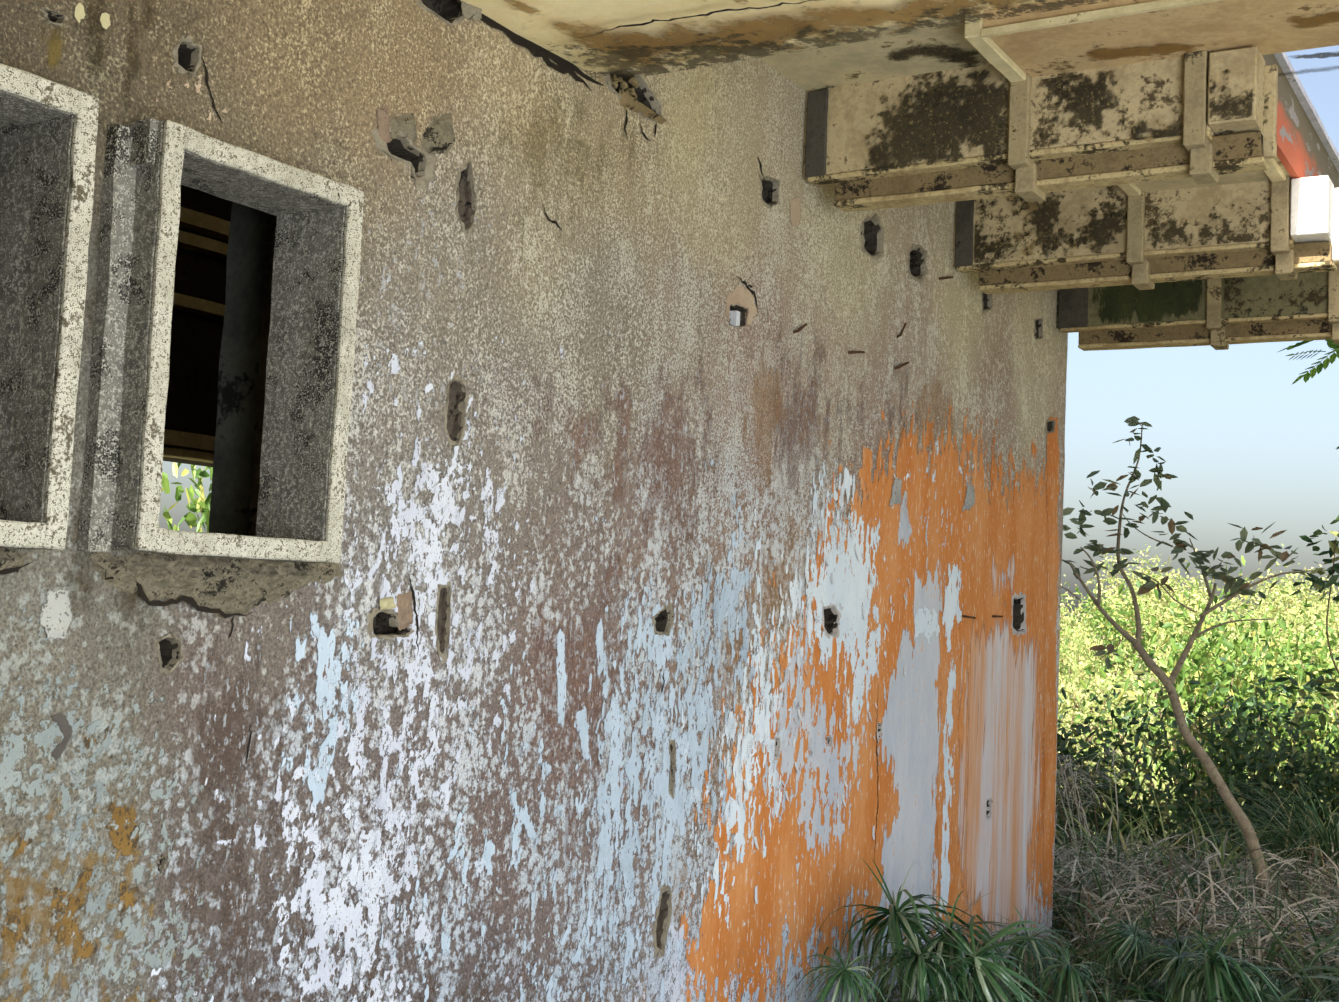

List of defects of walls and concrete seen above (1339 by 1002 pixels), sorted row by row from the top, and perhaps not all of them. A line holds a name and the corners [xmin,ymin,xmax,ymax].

leakage [534,0,1114,173]
leakage [1036,45,1203,147]
leakage [1209,69,1253,122]
flaking render [371,105,455,192]
flaking render [456,158,477,239]
leakage [974,192,1126,263]
leakage [1147,197,1270,249]
leakage [1093,280,1203,324]
spalling [89,551,344,620]
flaking render [333,591,415,724]
peeling [575,705,592,761]
peeling [596,388,1064,1002]